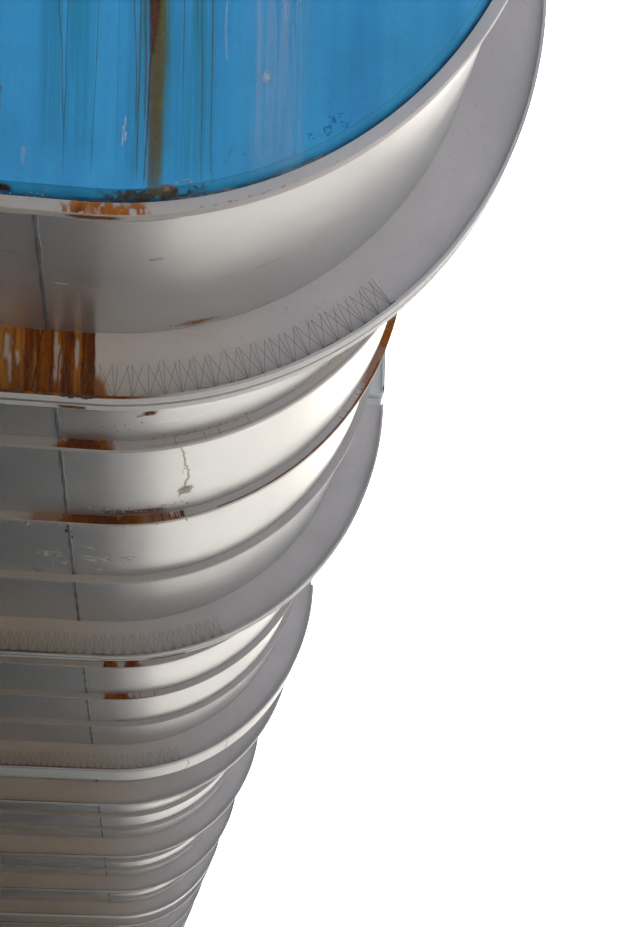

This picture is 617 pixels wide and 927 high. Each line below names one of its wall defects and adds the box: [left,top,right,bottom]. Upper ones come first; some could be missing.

corrosion [62,0,197,220]
corrosion [0,326,144,411]
corrosion [57,313,398,525]